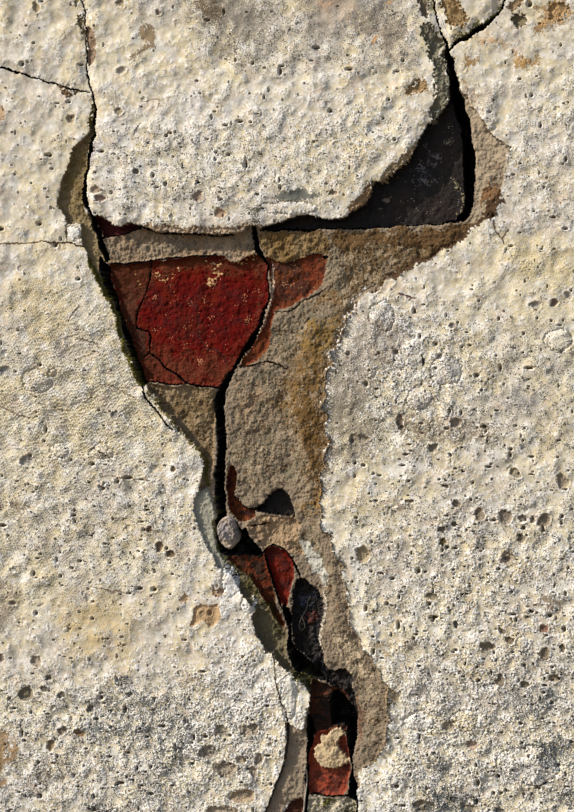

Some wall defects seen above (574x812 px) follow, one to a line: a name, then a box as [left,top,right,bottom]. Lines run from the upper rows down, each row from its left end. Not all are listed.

spalling [56,104,111,287]
crack [493,220,509,245]
crack [0,0,506,680]
spalling [141,0,512,795]
spalling [500,551,516,565]
hole [46,726,86,752]
hole [206,789,255,812]
spalling [267,707,315,812]